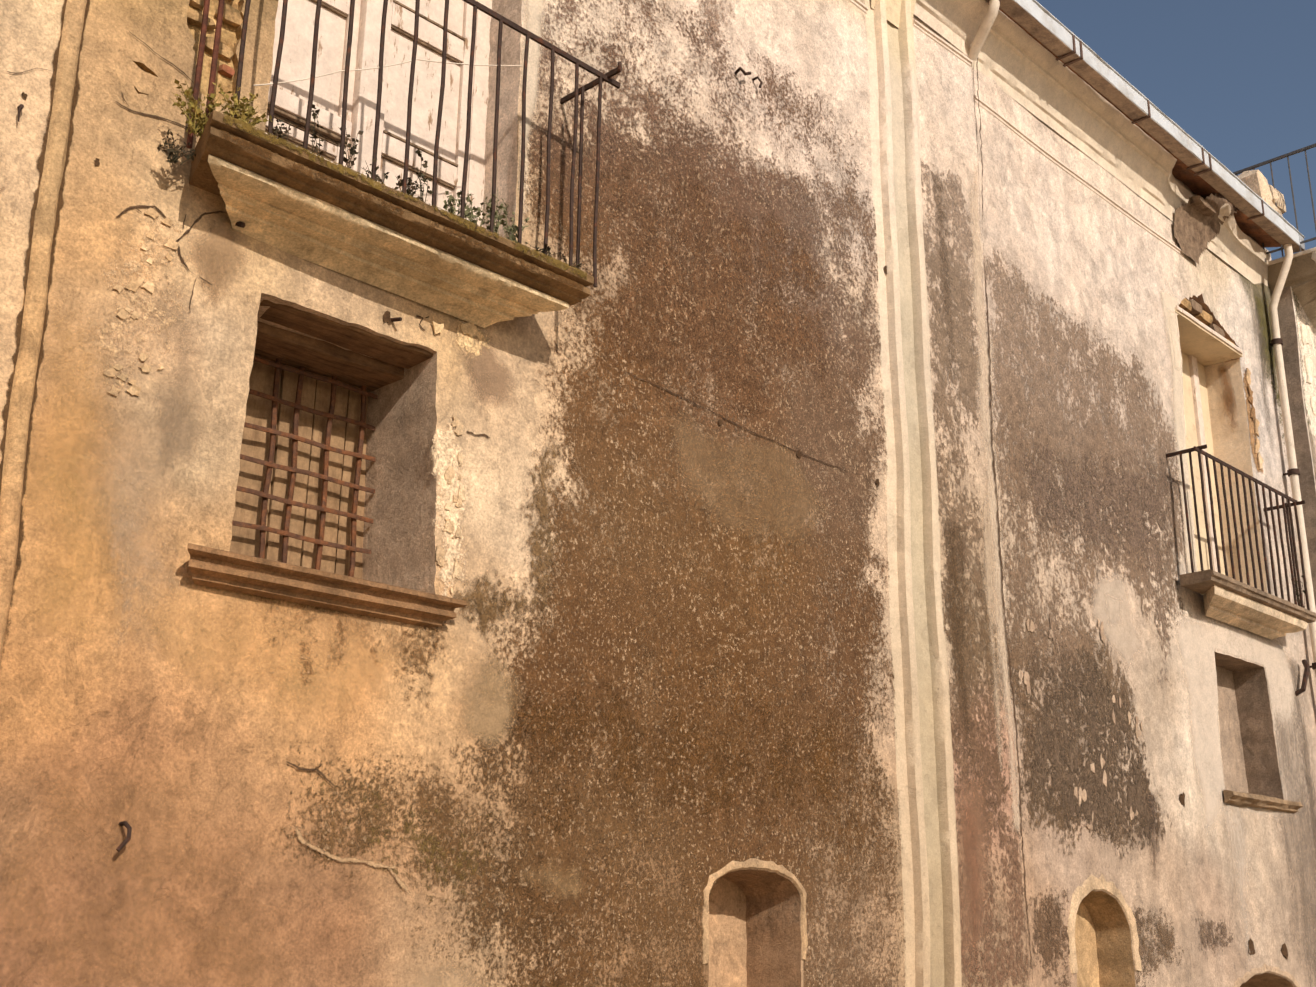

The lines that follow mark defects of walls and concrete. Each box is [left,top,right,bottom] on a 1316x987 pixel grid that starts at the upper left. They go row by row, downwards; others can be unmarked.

crack [117,93,188,128]
crack [130,32,192,81]
leakage [219,129,411,214]
crack [0,0,90,650]
flaking render [94,191,192,397]
crack [116,205,223,309]
flaking render [1296,315,1316,439]
leakage [272,0,906,987]
leakage [920,160,1186,987]